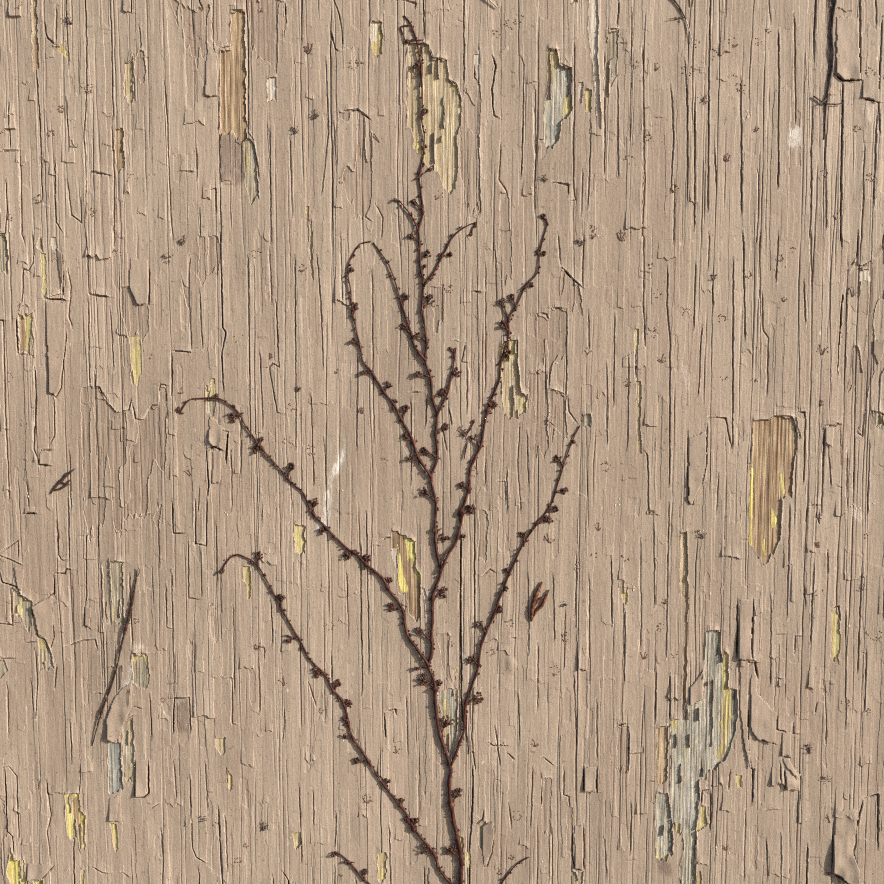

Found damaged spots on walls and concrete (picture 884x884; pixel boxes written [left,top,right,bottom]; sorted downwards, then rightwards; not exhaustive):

crack [3,766,127,884]
crack [0,0,142,717]
peeling [106,654,150,851]
crack [129,80,226,419]
peeling [407,43,481,216]
crack [460,523,538,884]
peeling [499,271,582,458]
crack [479,0,648,471]
peeling [544,0,619,149]
peeling [655,532,801,884]
peeling [749,416,803,564]
crack [736,379,884,739]